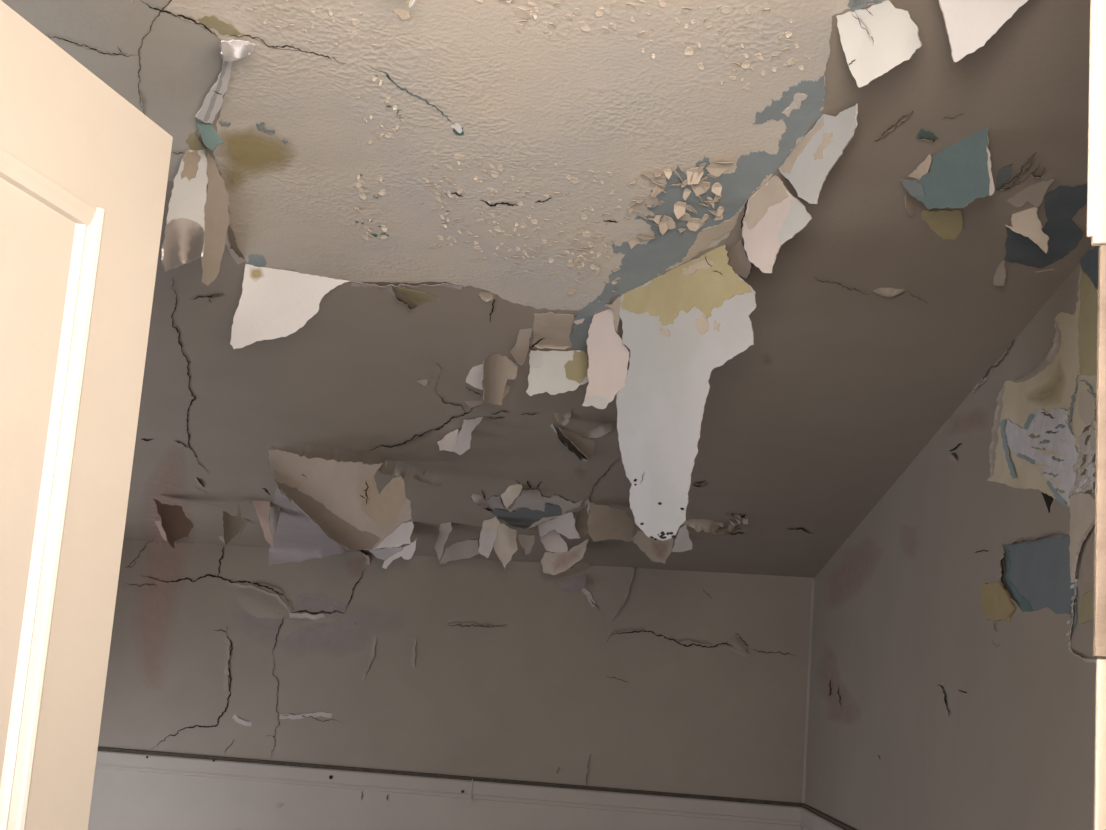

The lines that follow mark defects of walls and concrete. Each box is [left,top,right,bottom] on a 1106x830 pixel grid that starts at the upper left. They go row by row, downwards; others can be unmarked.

crack [47,0,346,115]
crack [373,68,455,125]
peeling [939,0,1028,62]
crack [141,277,225,471]
peeling [161,0,922,578]
peeling [900,128,1100,646]
crack [125,541,365,756]
crack [581,587,791,658]